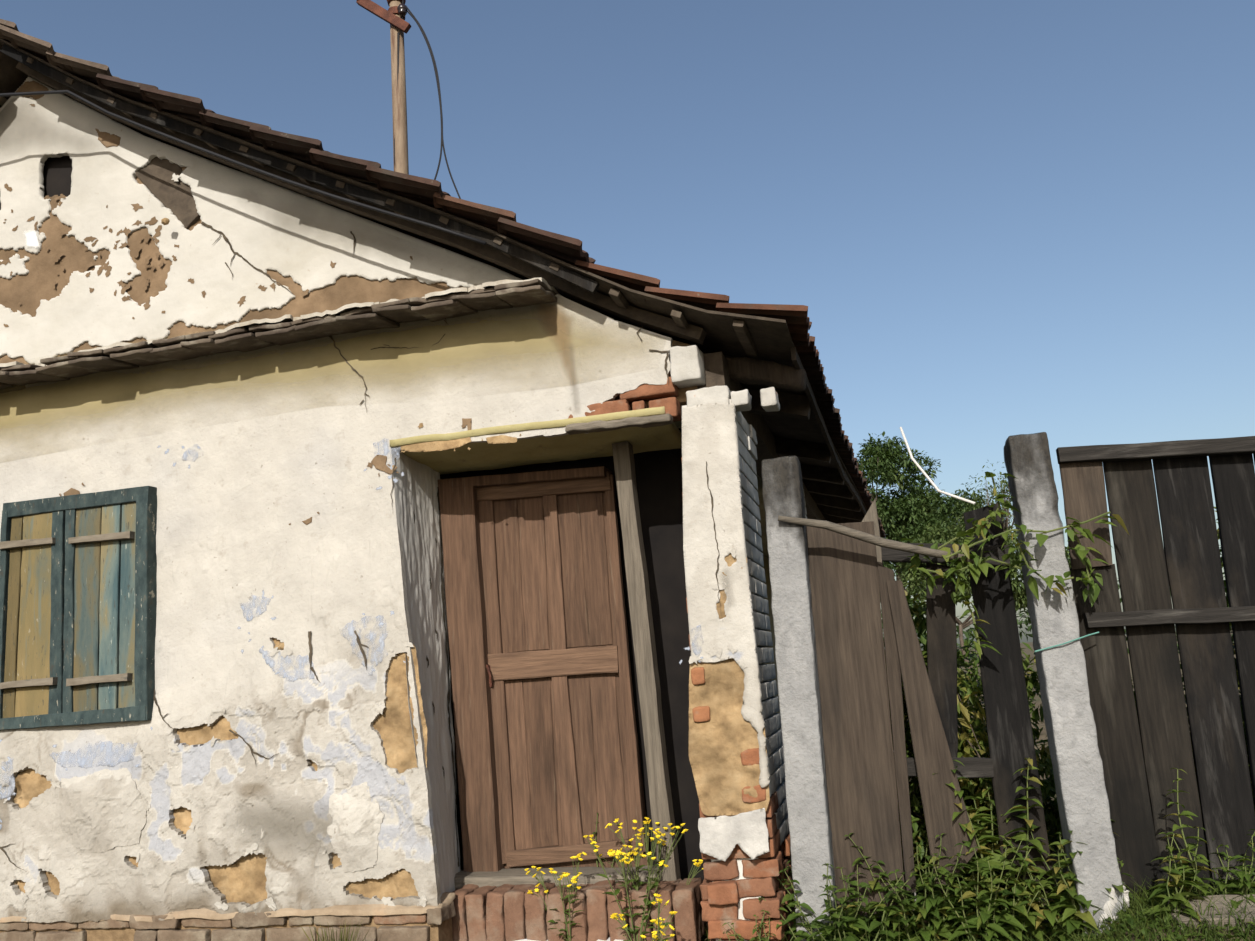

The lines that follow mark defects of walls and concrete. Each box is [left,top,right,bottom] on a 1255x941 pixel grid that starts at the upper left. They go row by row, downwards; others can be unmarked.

peeling [0,157,477,339]
crack [201,221,293,294]
peeling [0,355,35,365]
peeling [57,342,102,357]
crack [329,318,448,413]
flaking render [151,707,239,752]
flaking render [348,611,435,786]
flaking render [0,741,139,808]
flaking render [679,626,796,941]
flaking render [15,871,60,902]
flaking render [205,842,277,911]
flaking render [346,868,427,907]